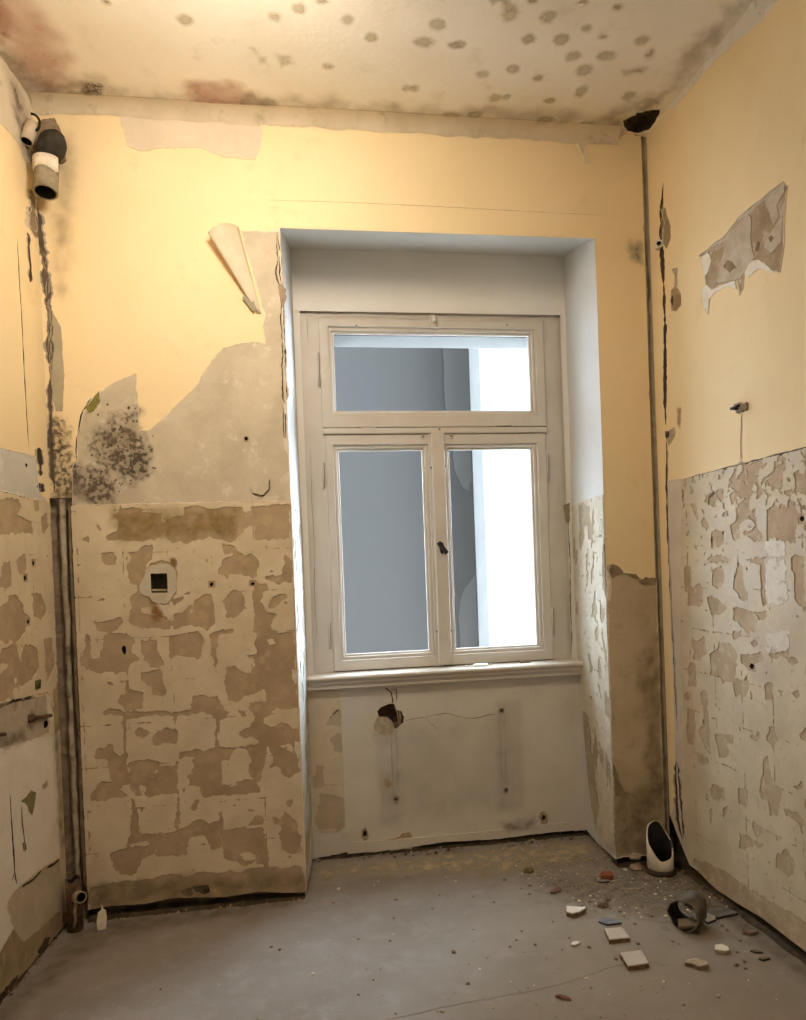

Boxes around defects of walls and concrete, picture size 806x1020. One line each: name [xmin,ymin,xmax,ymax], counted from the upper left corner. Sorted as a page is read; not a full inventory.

flaking render [623,0,777,138]
peeling [119,116,263,160]
peeling [699,182,788,314]
peeling [0,448,48,503]
mould [47,406,156,504]
peeling [71,223,806,965]
flaking render [0,733,67,1005]
crack [387,964,624,1020]